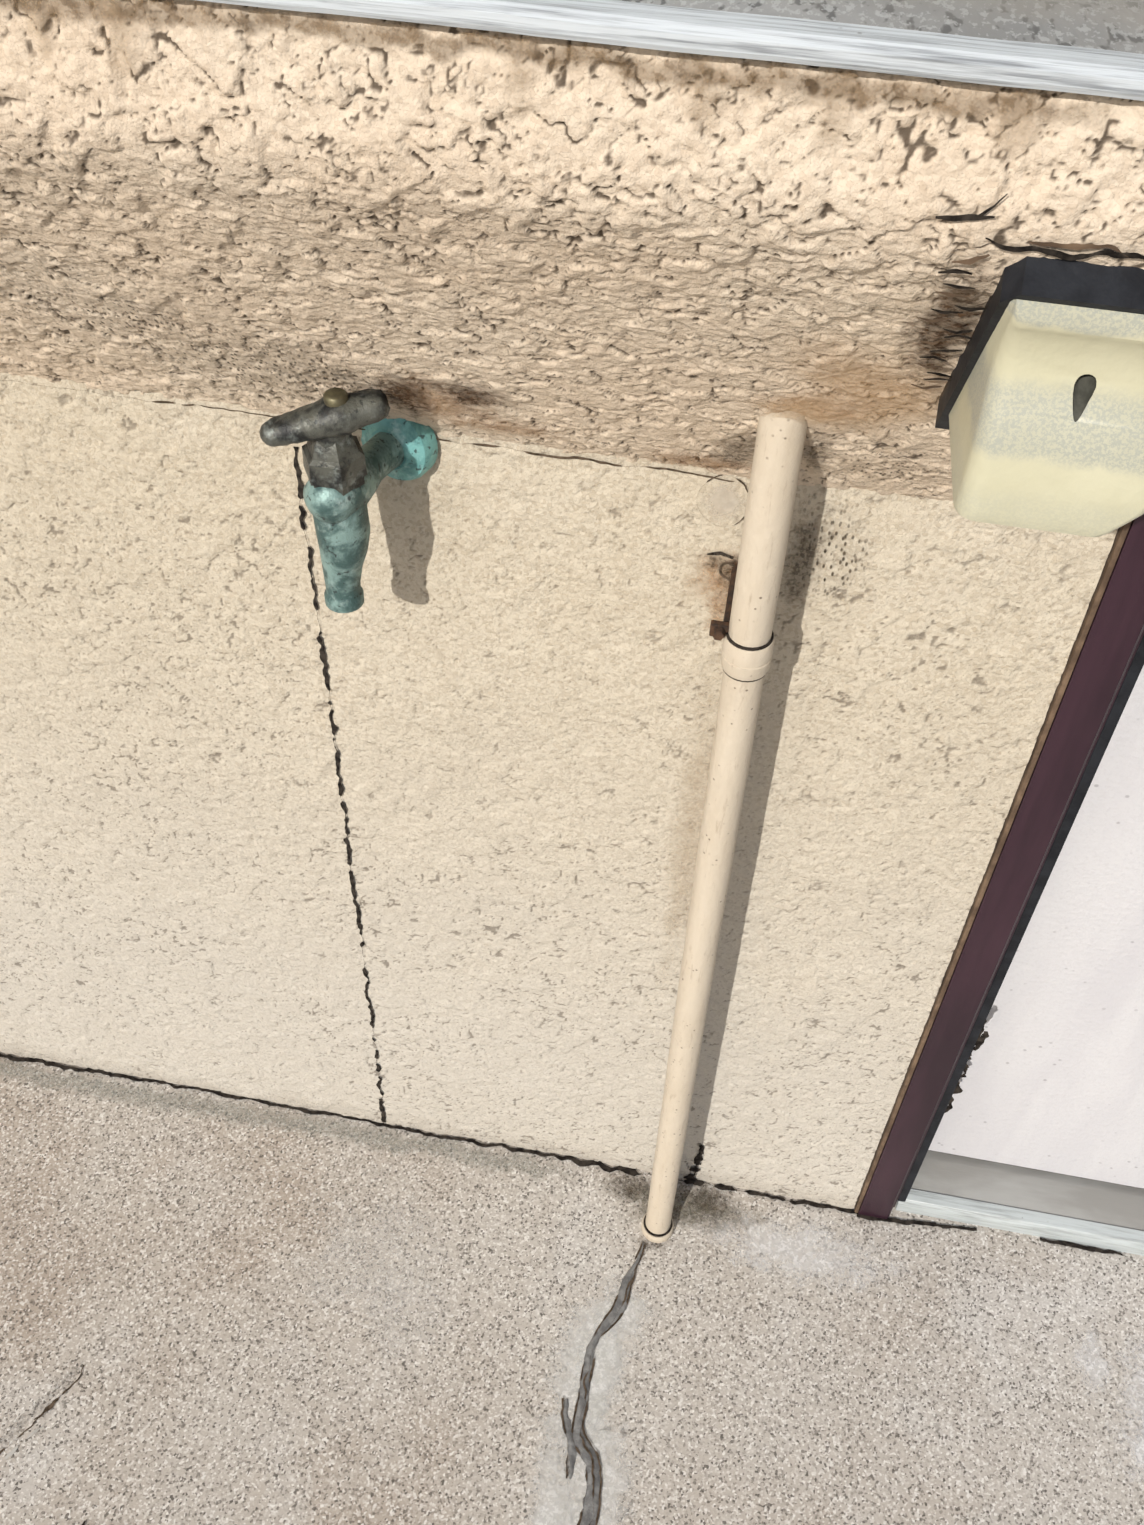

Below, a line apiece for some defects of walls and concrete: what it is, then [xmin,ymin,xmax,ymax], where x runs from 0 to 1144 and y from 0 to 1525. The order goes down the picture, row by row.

crack [935,194,1008,222]
corrosion [707,551,738,581]
crack [0,380,977,1231]
crack [1040,1237,1128,1257]
crack [561,1243,646,1525]